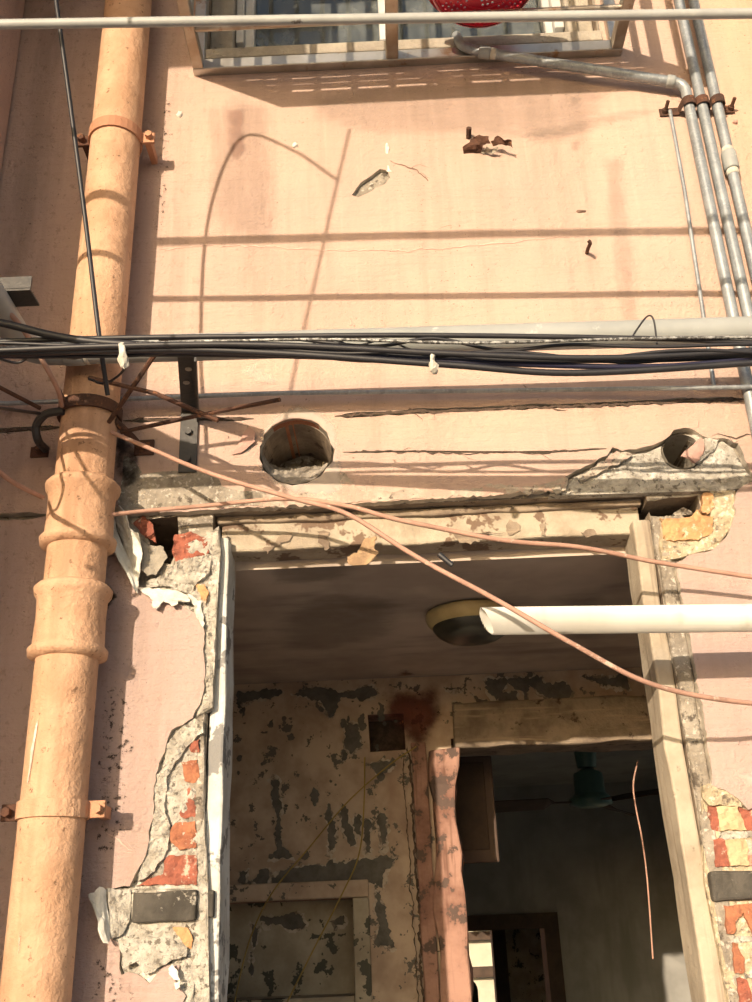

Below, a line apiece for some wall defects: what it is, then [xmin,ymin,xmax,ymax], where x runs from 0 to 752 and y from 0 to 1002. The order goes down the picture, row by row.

crack [339,397,744,421]
flaking render [232,425,256,455]
crack [351,448,594,460]
flaking render [88,435,752,1002]